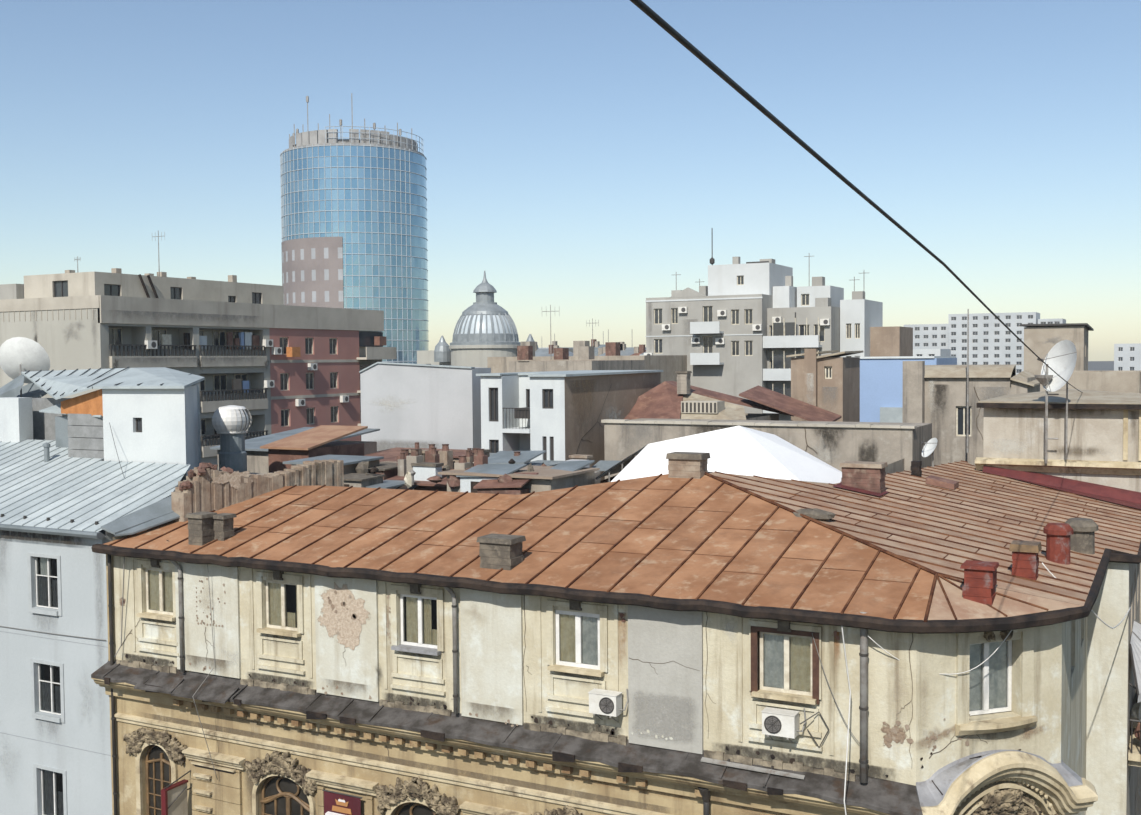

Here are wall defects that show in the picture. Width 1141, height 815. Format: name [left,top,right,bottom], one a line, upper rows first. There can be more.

flaking render [317,582,370,663]
crack [630,612,716,732]
flaking render [880,718,969,768]